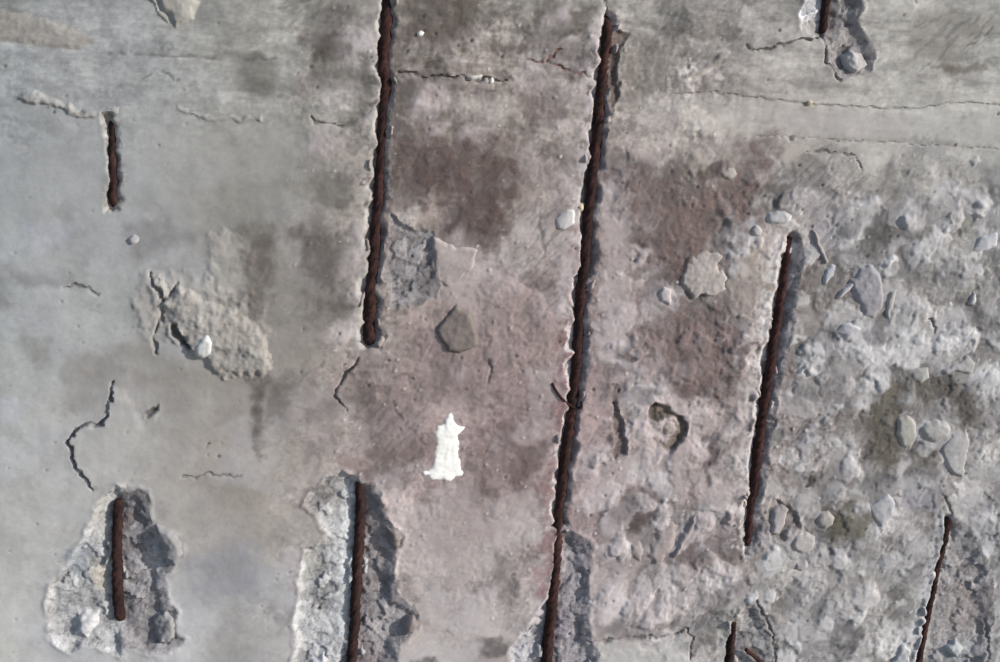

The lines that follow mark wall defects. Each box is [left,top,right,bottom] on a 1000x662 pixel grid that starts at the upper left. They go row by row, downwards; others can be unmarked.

flaking render [681,247,727,299]
crack [66,381,115,490]
flaking render [171,323,212,359]
spalling [508,8,631,662]
spalling [648,402,690,452]
spalling [739,211,836,571]
flaking render [896,415,969,477]
spalling [44,484,186,658]
spalling [292,468,421,662]
flaking render [631,513,697,565]
spalling [724,600,777,662]
spalling [891,512,996,662]